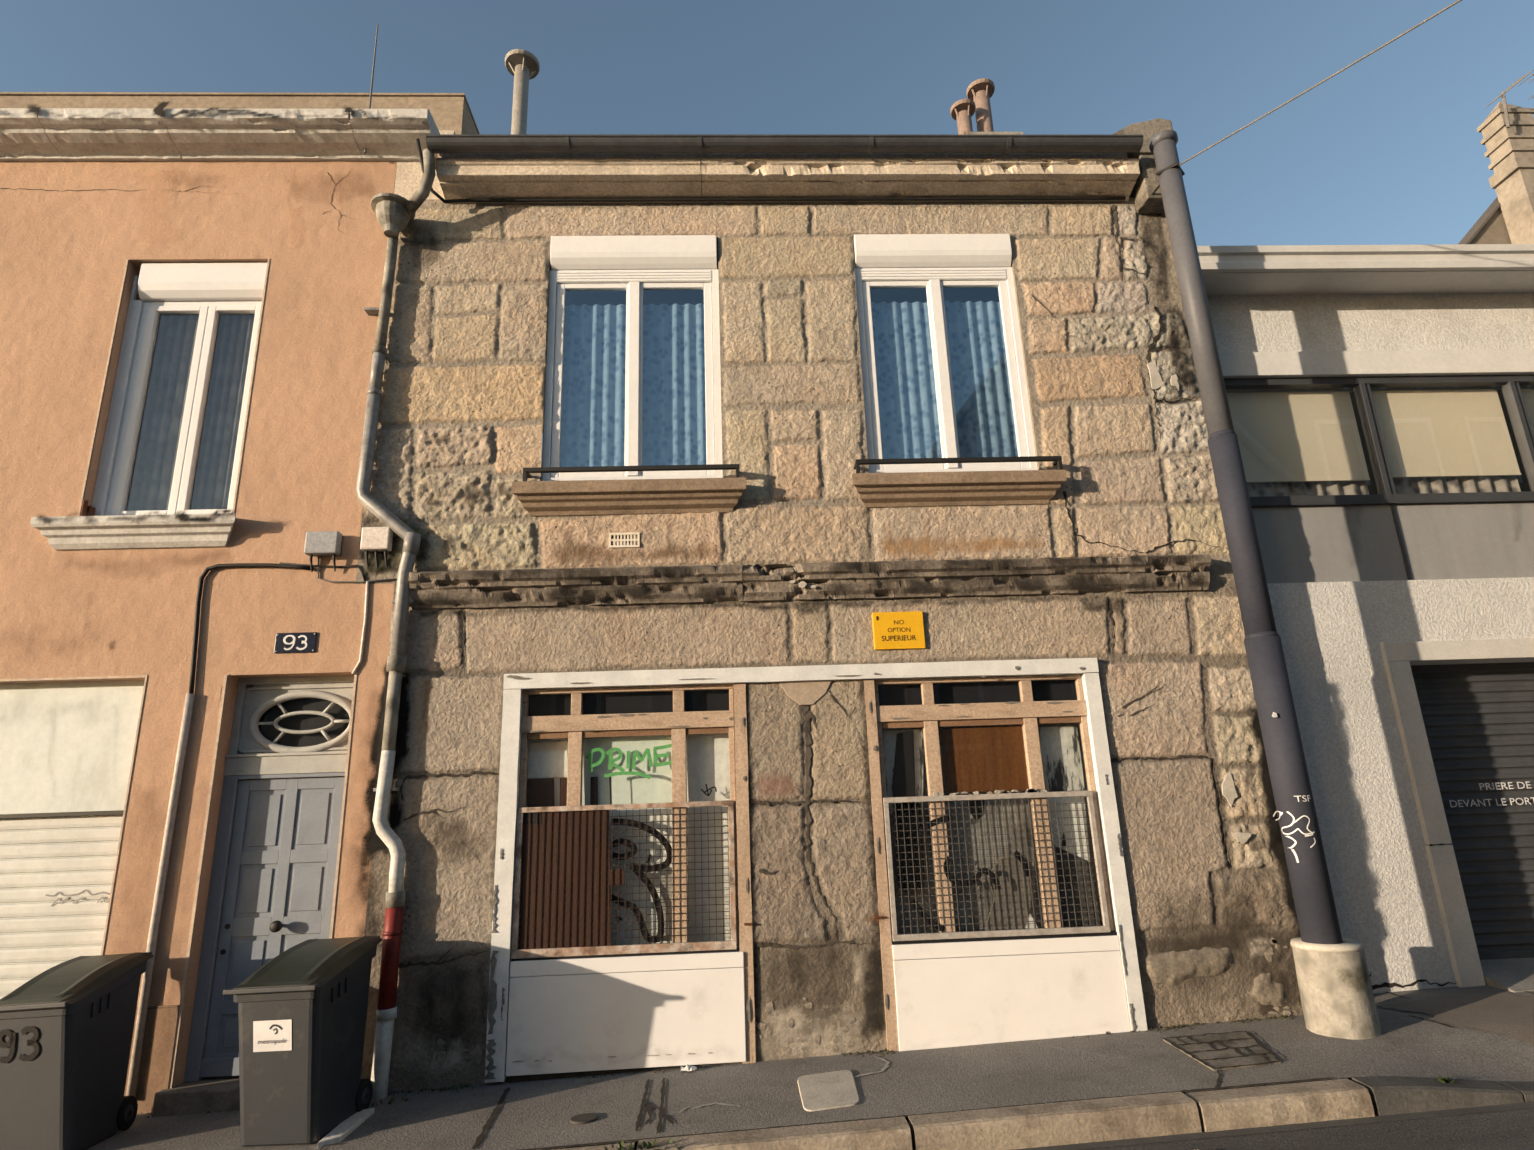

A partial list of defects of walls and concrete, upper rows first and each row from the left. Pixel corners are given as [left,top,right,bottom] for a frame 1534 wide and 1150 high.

crack [323,167,353,235]
crack [1112,205,1195,441]
damp [1145,214,1194,390]
crack [1062,491,1217,554]
damp [360,664,409,936]
crack [749,685,870,950]
peeling [485,885,552,1080]